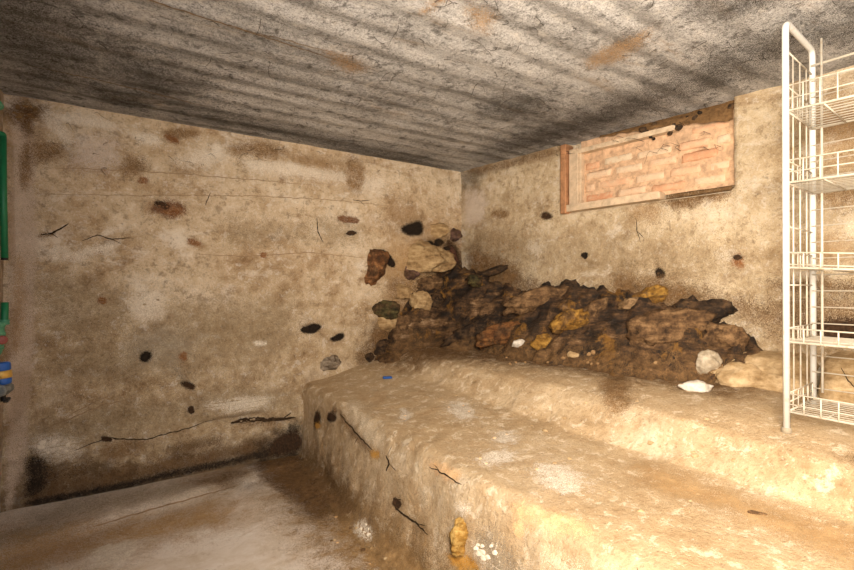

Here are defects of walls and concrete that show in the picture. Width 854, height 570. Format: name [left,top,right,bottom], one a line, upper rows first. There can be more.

water stain [0,0,854,356]
crack [231,413,298,427]
crack [338,411,396,471]
water stain [0,419,333,570]
crack [392,496,428,535]